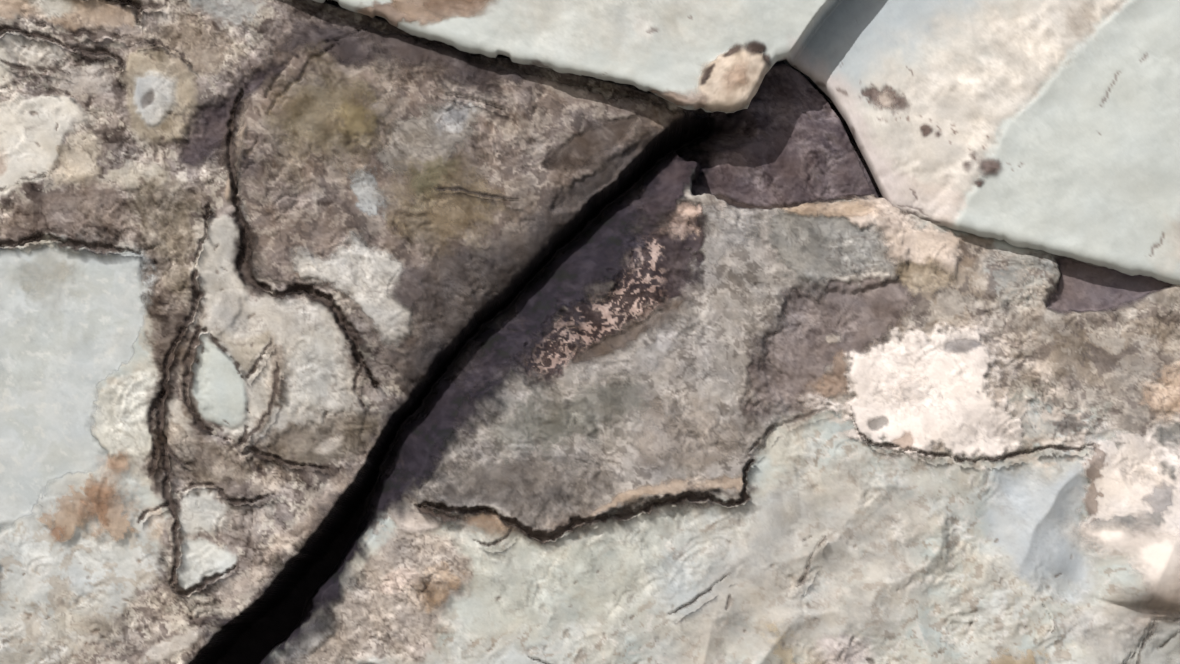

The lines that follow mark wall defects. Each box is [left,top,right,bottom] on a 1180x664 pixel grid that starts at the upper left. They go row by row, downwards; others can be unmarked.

crack [430,84,509,109]
spalling [180,22,1022,535]
spalling [1046,256,1172,312]
peeling [0,245,153,528]
crack [137,89,714,664]
peeling [1080,362,1180,537]
crack [669,574,729,615]